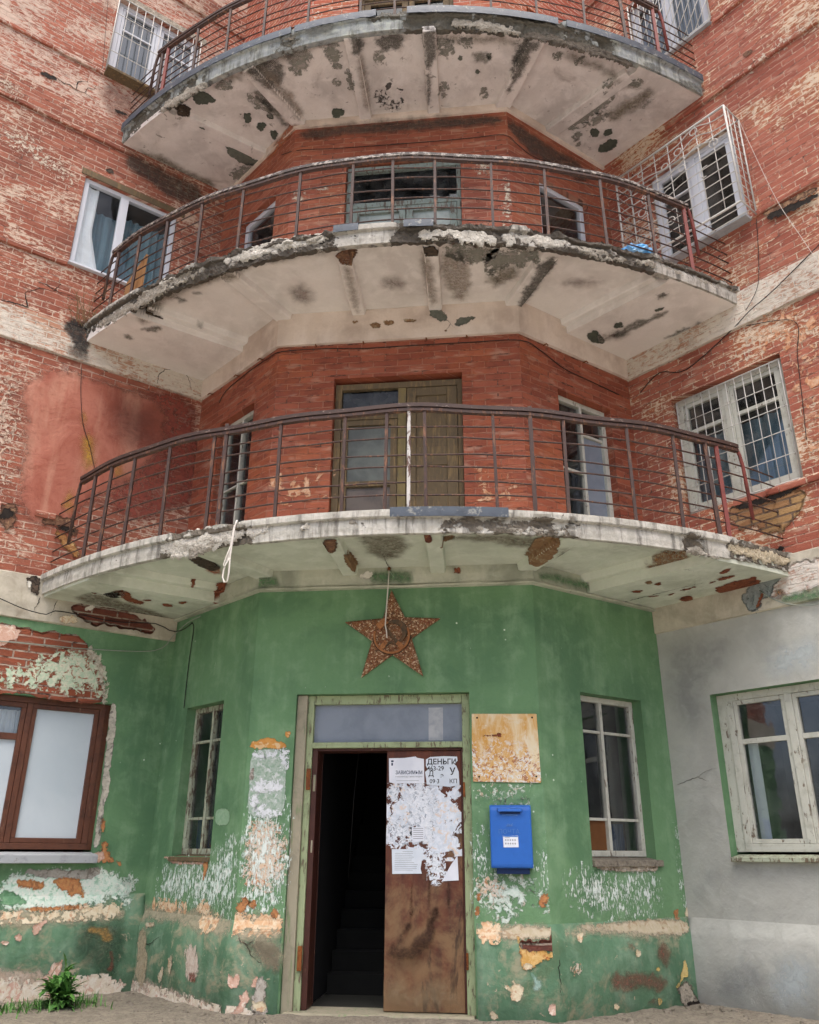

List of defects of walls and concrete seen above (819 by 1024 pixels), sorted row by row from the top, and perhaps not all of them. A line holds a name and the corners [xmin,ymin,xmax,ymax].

water stain [306,24,332,35]
water stain [552,51,660,131]
water stain [509,124,586,180]
spalling [418,178,736,293]
rust [632,581,697,602]
rust [647,550,688,568]
rust [709,569,760,593]
flaking render [0,604,155,848]
peeling [0,865,139,946]
peeling [131,795,294,1015]
peeling [470,825,553,970]
peeling [562,827,700,1006]